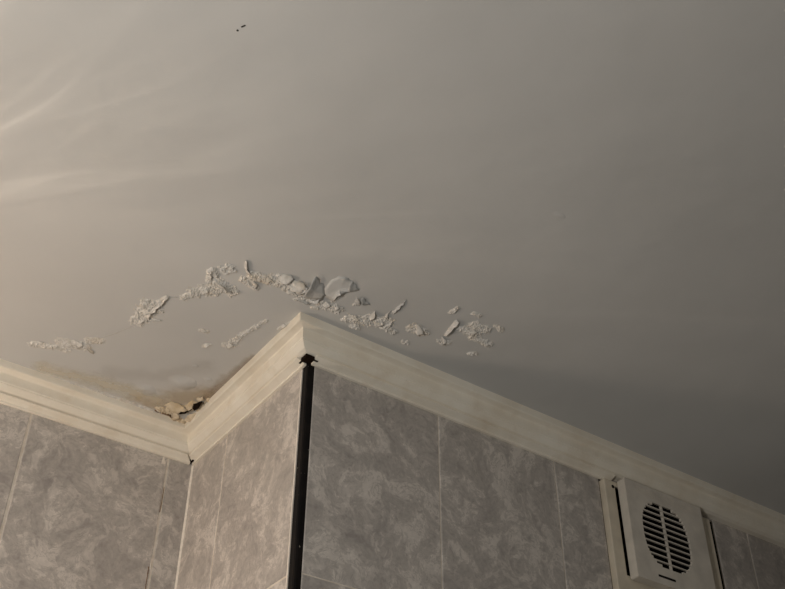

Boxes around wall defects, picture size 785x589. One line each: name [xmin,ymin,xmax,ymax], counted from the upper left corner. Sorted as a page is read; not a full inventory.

peeling [127,261,505,356]
flaking render [155,396,210,424]